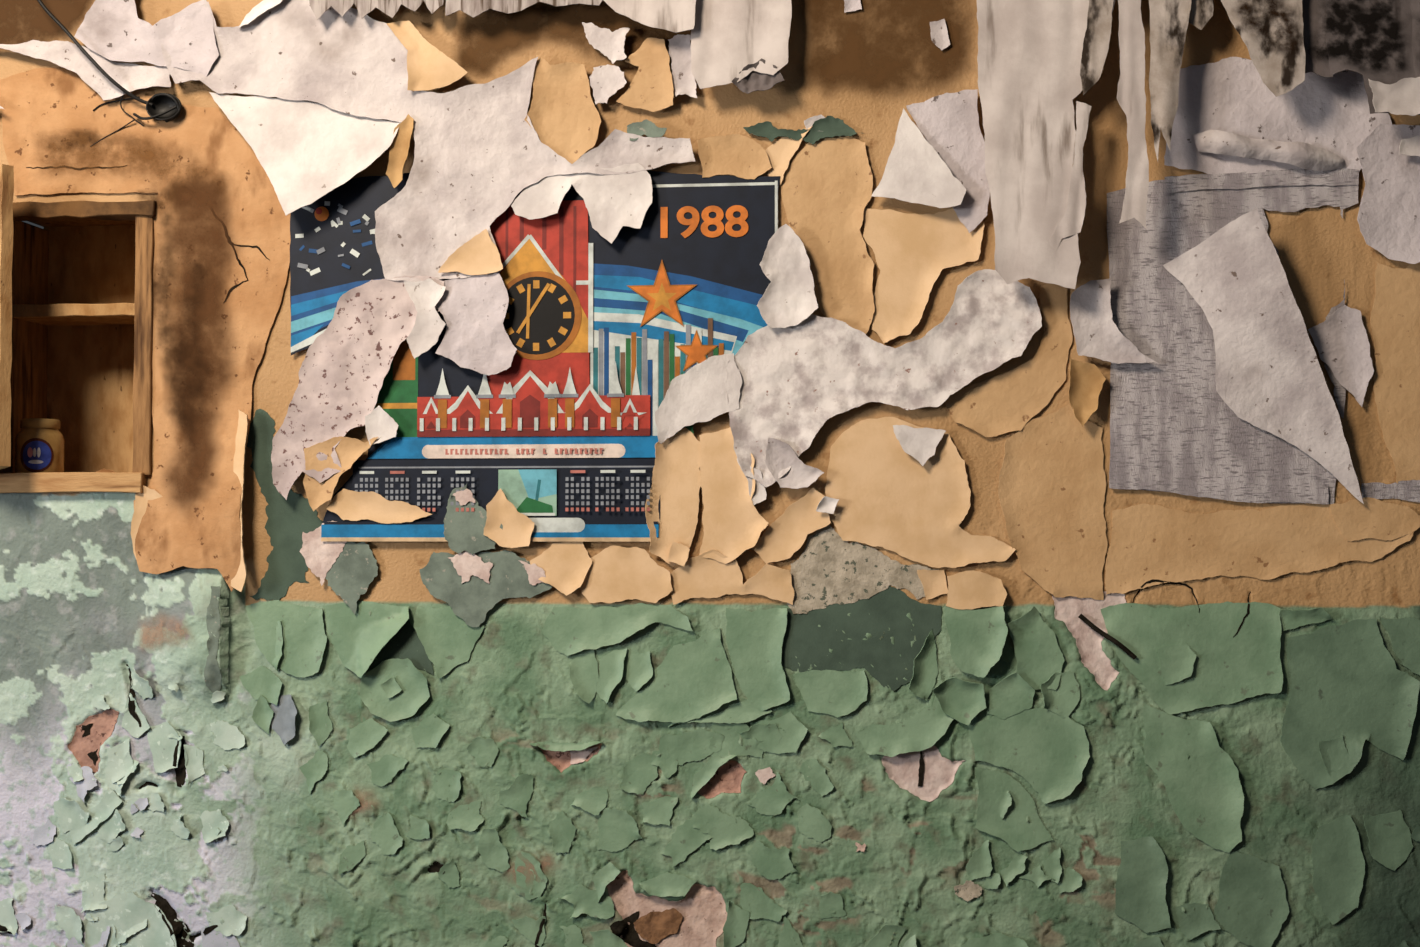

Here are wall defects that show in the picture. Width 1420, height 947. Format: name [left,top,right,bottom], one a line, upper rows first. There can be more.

peeling [616,37,674,112]
peeling [697,126,984,343]
damp [47,133,230,502]
peeling [300,489,432,586]
peeling [432,262,1420,947]
crack [1131,579,1200,611]
crack [126,664,141,727]
crack [139,736,188,789]
peeling [32,600,485,875]
crack [427,861,445,873]
peeling [50,873,177,947]
crack [151,893,218,947]